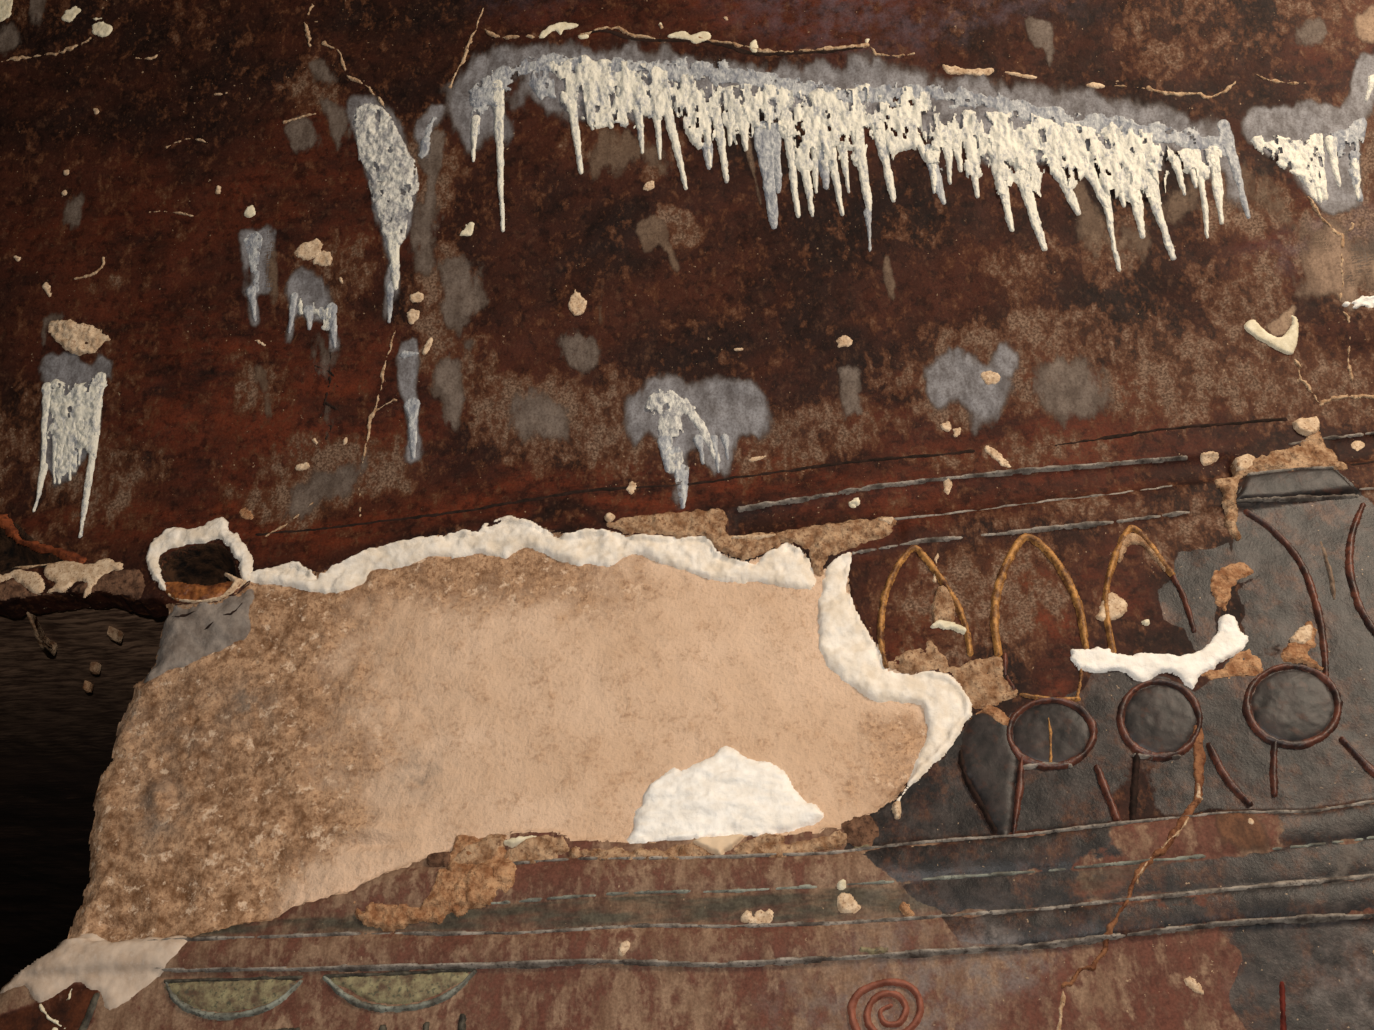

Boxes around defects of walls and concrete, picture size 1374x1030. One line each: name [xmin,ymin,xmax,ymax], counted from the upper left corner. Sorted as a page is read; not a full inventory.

crack [448,8,1037,88]
crack [1086,74,1298,99]
damp [239,225,340,374]
damp [285,5,1374,463]
flaking render [1244,220,1374,355]
damp [33,313,113,538]
damp [624,374,772,509]
rust [0,514,87,564]
flaking render [0,522,146,657]
flaking render [67,498,928,943]
flaking render [860,585,1018,726]
crack [1057,725,1206,1030]